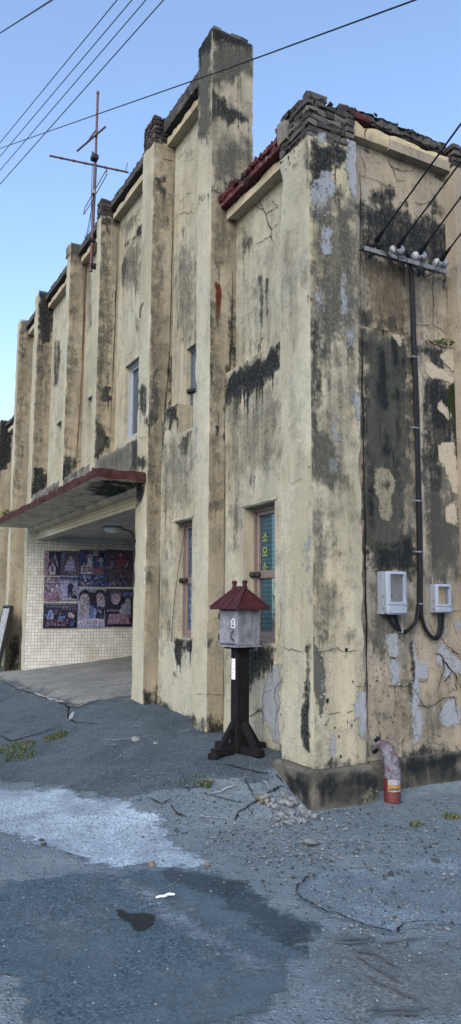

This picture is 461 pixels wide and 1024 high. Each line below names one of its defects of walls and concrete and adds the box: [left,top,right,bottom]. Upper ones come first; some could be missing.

damp [197,29,254,279]
crack [255,201,289,245]
peeling [311,139,370,256]
damp [0,290,83,498]
damp [70,215,196,540]
damp [210,275,280,481]
damp [305,137,461,702]
peeling [257,663,282,744]
damp [285,758,378,807]
peeling [351,620,461,747]